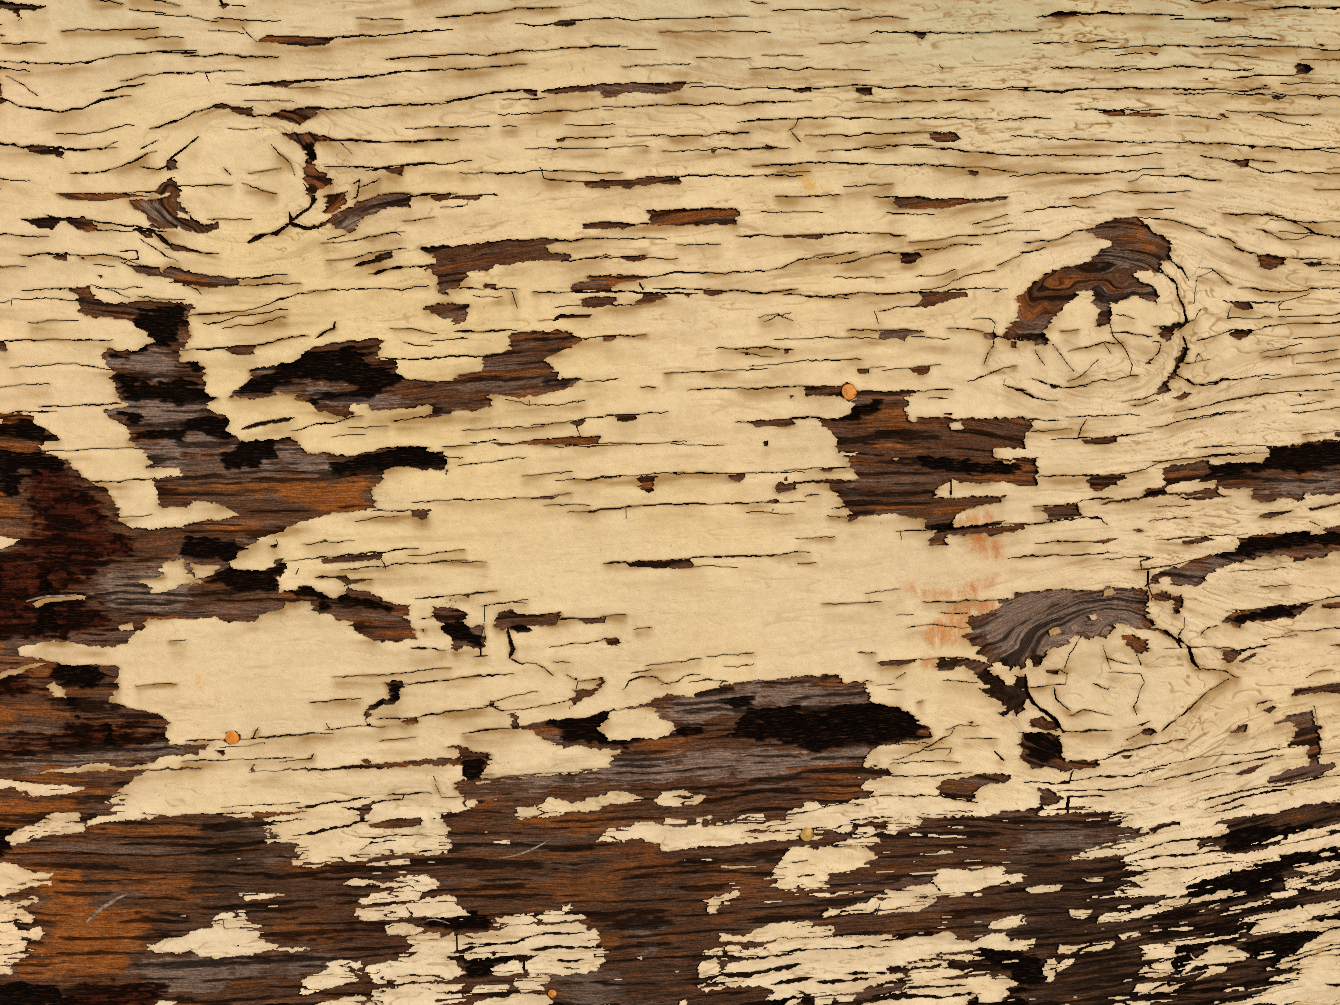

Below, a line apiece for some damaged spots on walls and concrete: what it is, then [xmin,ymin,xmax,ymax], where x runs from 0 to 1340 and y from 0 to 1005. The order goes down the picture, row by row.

peeling [21,159,240,288]
peeling [356,251,393,265]
peeling [420,237,572,325]
peeling [581,176,682,189]
peeling [582,206,740,230]
peeling [900,252,922,264]
peeling [892,196,1008,209]
peeling [983,216,1172,348]
crack [0,0,1340,770]
peeling [0,254,1340,1005]
crack [766,567,1340,878]